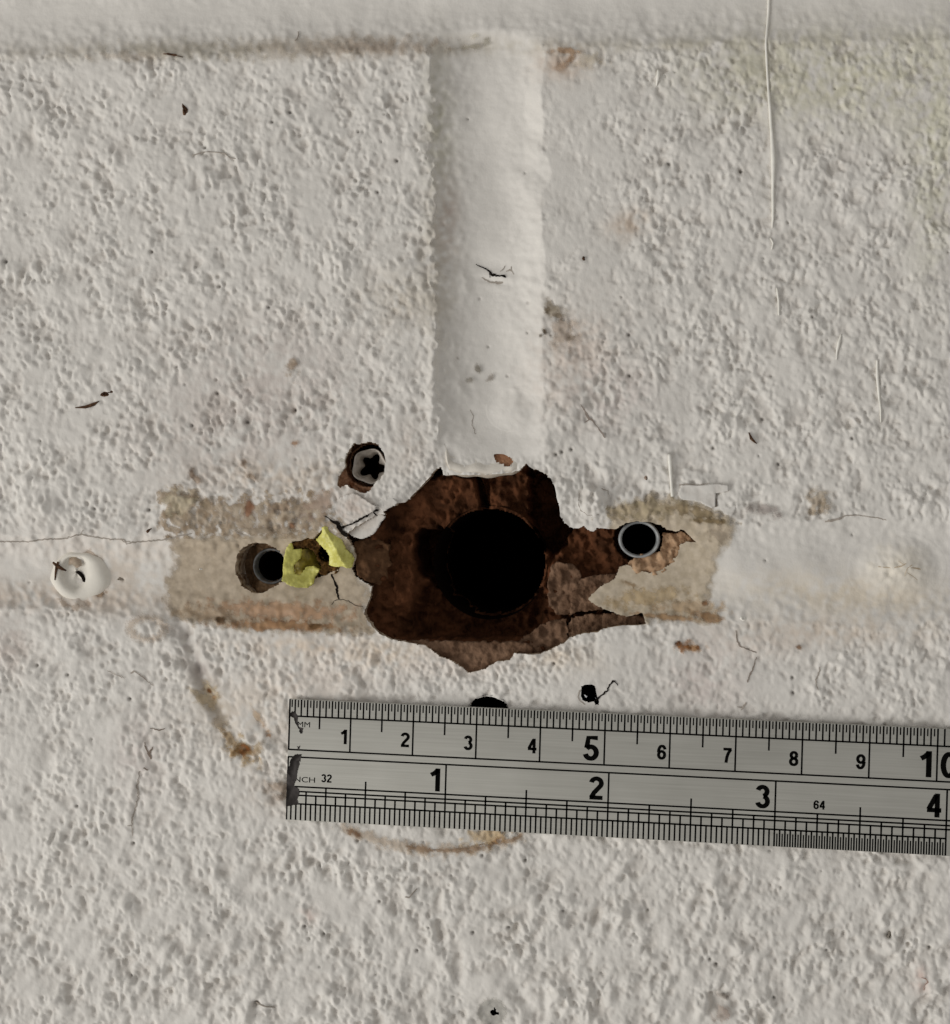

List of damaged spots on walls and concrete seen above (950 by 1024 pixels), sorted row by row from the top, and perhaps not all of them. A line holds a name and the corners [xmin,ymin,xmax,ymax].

crack [0,530,192,545]
spalling [156,444,736,673]